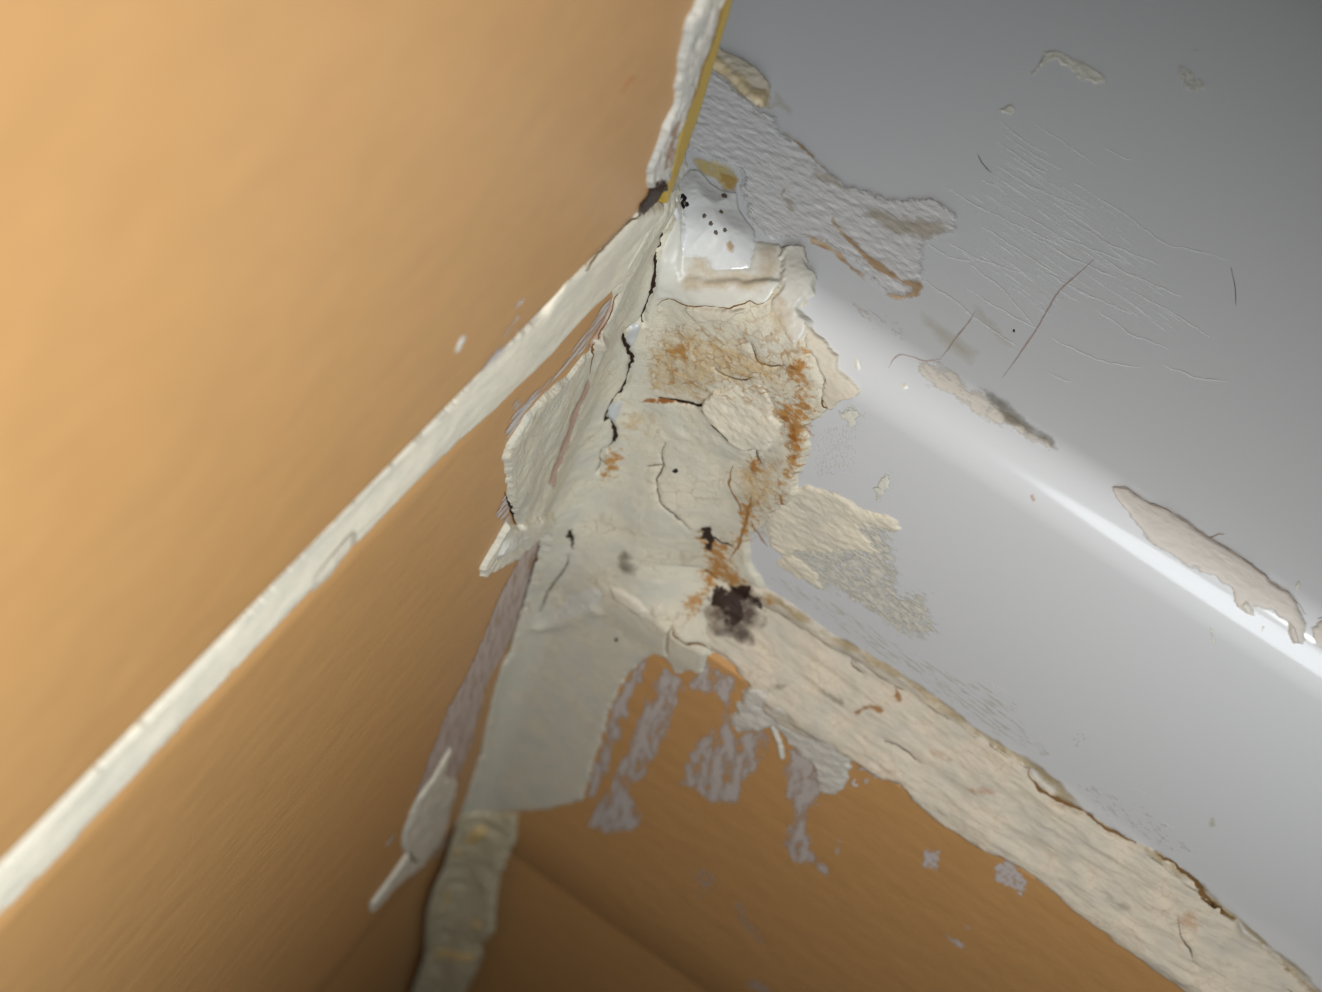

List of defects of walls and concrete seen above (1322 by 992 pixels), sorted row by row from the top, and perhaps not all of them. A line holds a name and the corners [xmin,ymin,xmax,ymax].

peeling [673,169,756,270]
crack [586,215,770,469]
corrosion [643,331,752,404]
crack [715,345,784,381]
peeling [701,384,782,452]
crack [646,442,688,527]
corrosion [685,349,814,615]
peeling [312,532,357,592]
peeling [479,512,556,577]
peeling [1237,600,1255,617]
peeling [1289,624,1299,643]